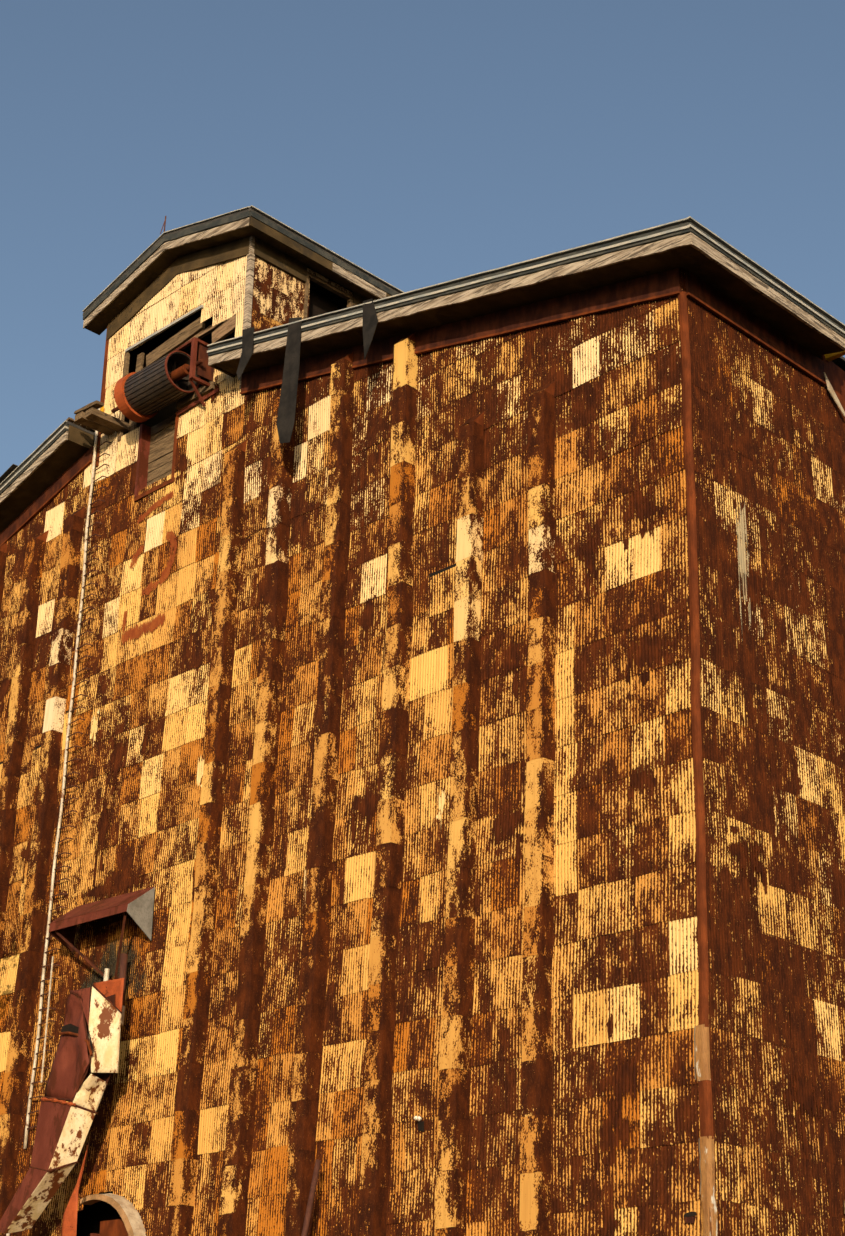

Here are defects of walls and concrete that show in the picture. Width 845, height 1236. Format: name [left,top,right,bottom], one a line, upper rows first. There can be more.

rust [175,451,192,488]
rust [617,479,662,554]
rust [357,595,380,652]
rust [0,675,12,721]
rust [495,629,528,700]
rust [81,726,153,903]
rust [344,784,378,852]
rust [486,807,525,869]
rust [624,761,661,828]
rust [729,826,768,894]
rust [593,1013,651,1170]
rust [593,1200,621,1236]